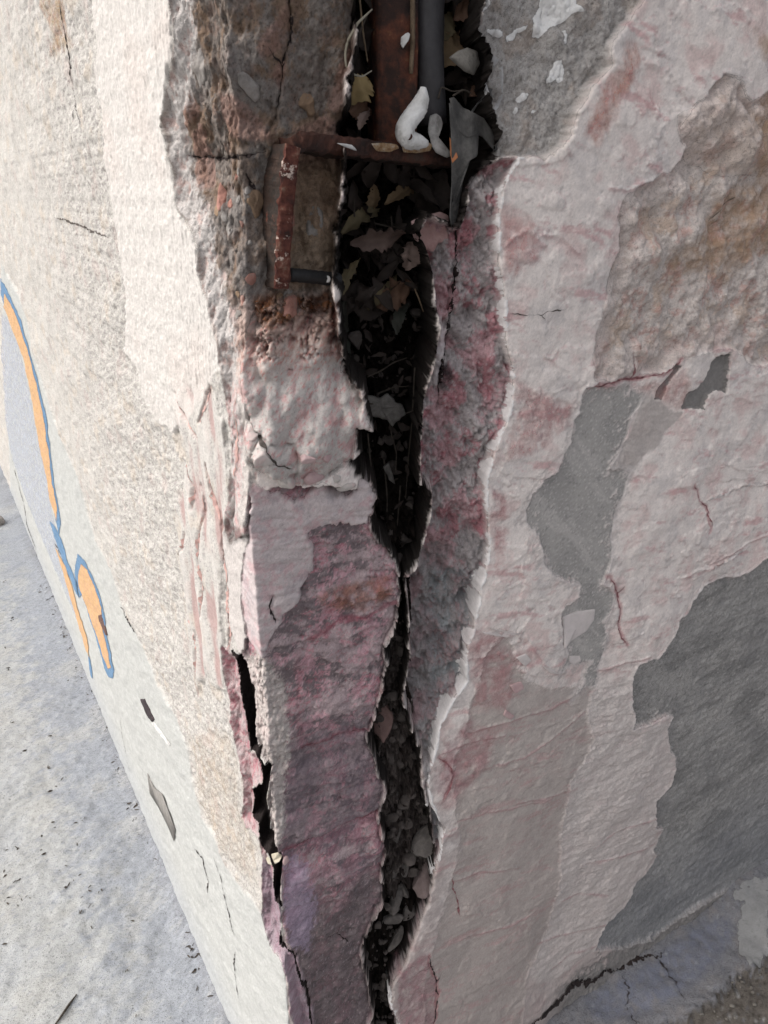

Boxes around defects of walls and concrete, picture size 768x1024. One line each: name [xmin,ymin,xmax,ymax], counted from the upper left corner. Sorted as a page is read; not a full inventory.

crack [60,9,81,163]
crack [54,217,109,238]
crack [192,0,294,190]
crack [355,0,367,17]
peeling [159,0,644,1024]
crack [338,66,468,553]
spalling [526,74,768,696]
spalling [147,773,175,841]
crack [231,650,312,1024]
crack [329,577,453,1024]
crack [534,952,688,1024]
peeling [596,559,768,950]